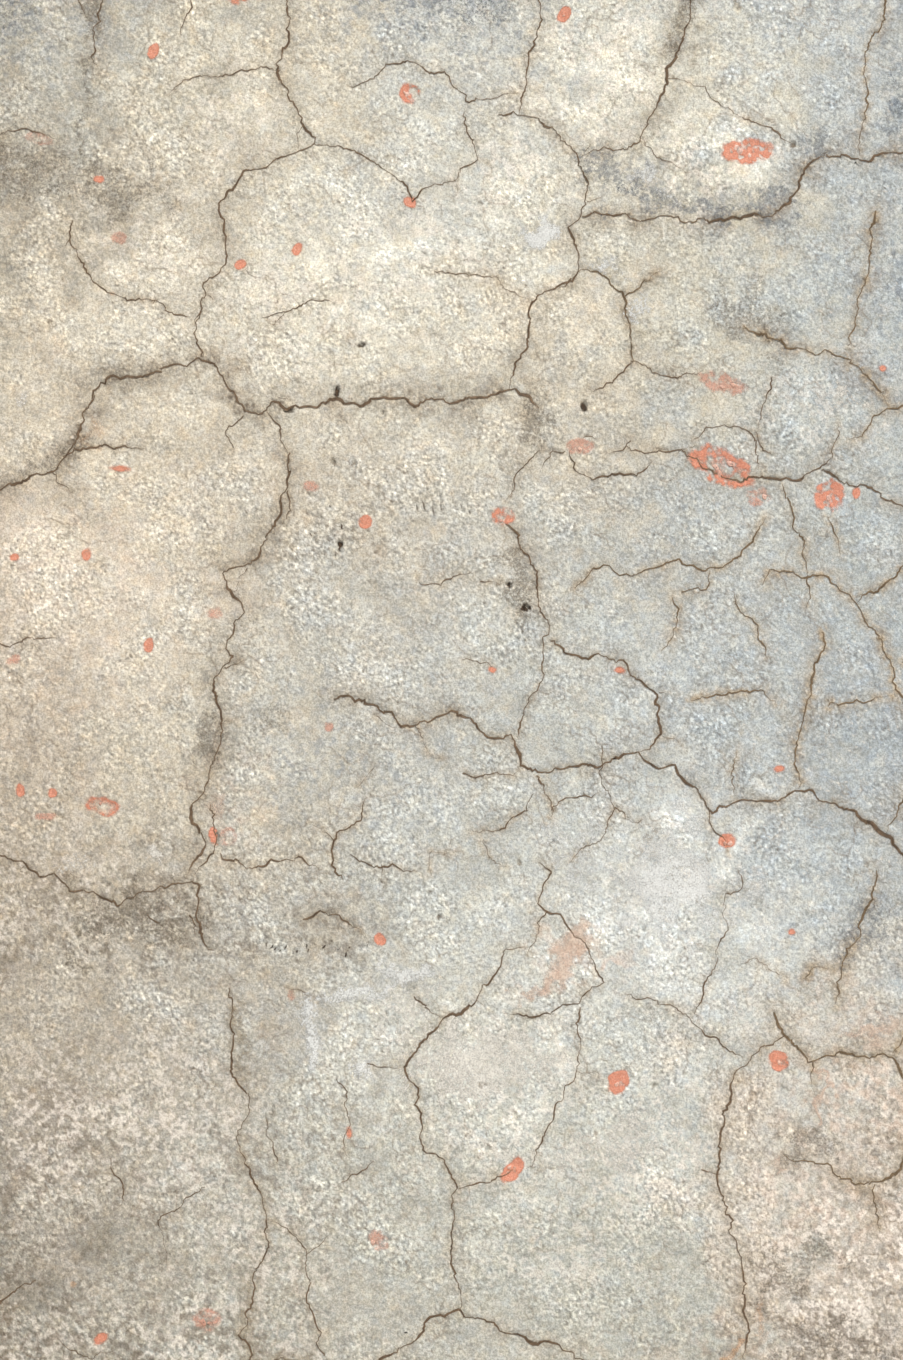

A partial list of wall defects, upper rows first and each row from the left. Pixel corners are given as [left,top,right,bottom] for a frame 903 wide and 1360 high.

crack [0,0,903,950]
crack [334,210,903,1360]
crack [0,1280,36,1304]
crack [157,1187,204,1269]
crack [228,988,325,1360]